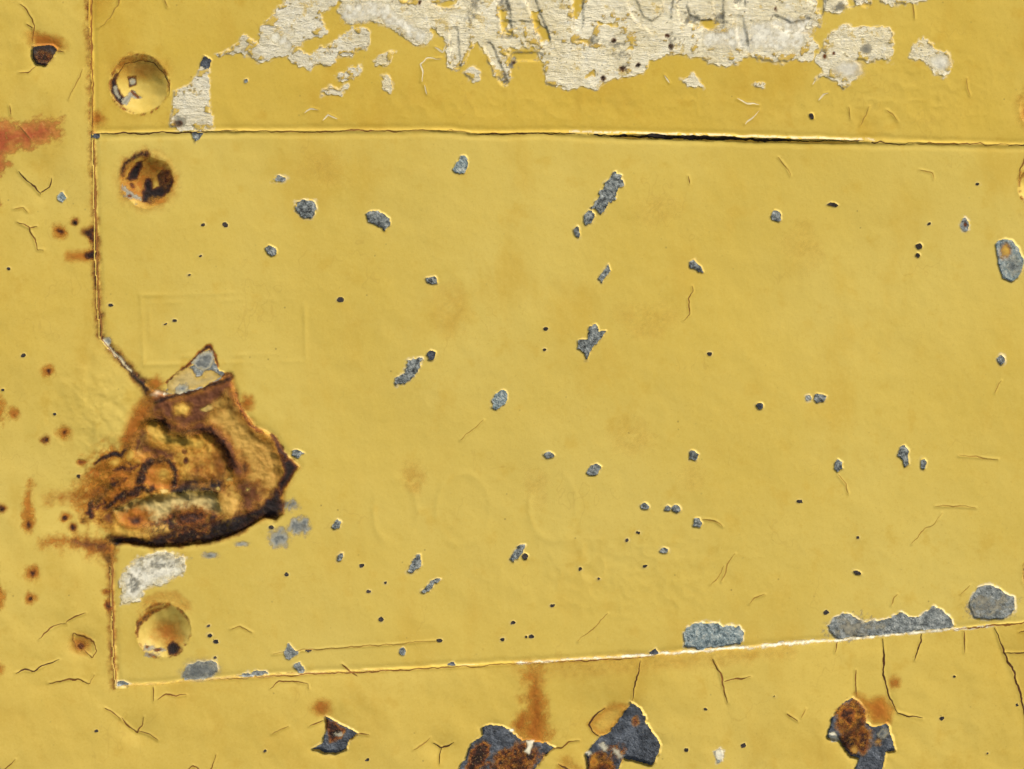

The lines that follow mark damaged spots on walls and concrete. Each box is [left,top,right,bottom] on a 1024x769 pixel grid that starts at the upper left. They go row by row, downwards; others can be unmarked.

peeling [169,0,894,141]
corrosion [40,192,266,681]
corrosion [21,480,34,530]
corrosion [27,566,38,578]
peeling [119,551,186,605]
peeling [683,622,744,650]
peeling [823,606,953,642]
crack [954,622,1024,714]
peeling [313,717,358,753]
corrosion [513,668,548,743]
peeling [585,703,660,769]
corrosion [860,698,893,723]